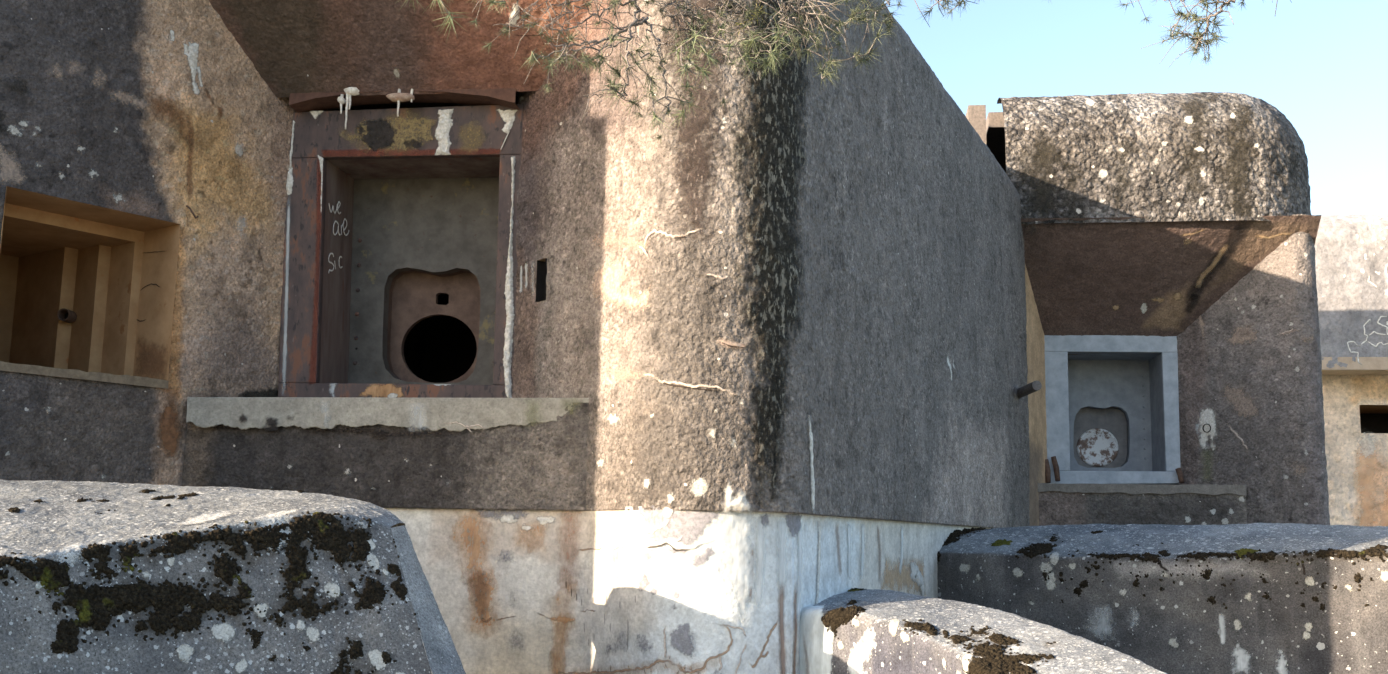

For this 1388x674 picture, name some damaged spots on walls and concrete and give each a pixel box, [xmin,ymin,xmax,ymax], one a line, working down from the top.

peeling [342,109,435,152]
corrosion [309,149,501,393]
damp [656,0,880,674]
crack [1347,264,1388,363]
corrosion [360,384,403,398]
crack [645,373,734,394]
corrosion [159,402,181,455]
crack [1227,425,1248,449]
crack [580,539,707,551]
corrosion [461,518,495,629]
crack [563,623,777,674]